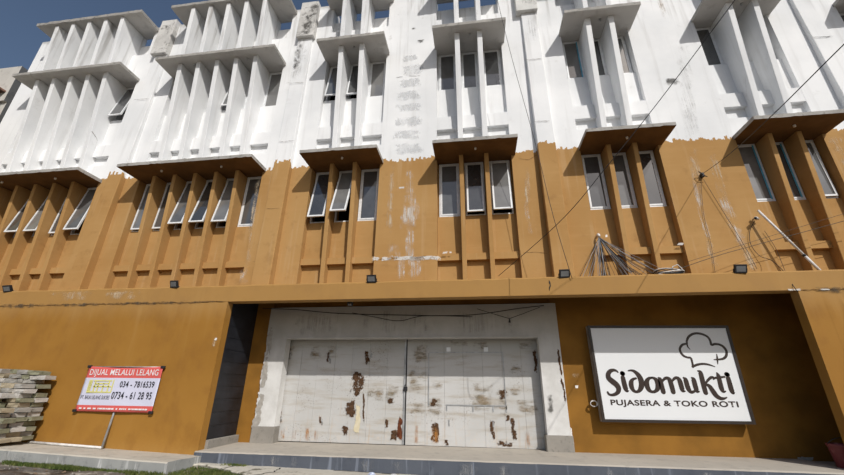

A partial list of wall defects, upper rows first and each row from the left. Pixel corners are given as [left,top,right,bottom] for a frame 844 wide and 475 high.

spalling [251,328,273,427]
rust [385,417,403,440]
rust [429,399,449,445]
rust [490,390,537,447]